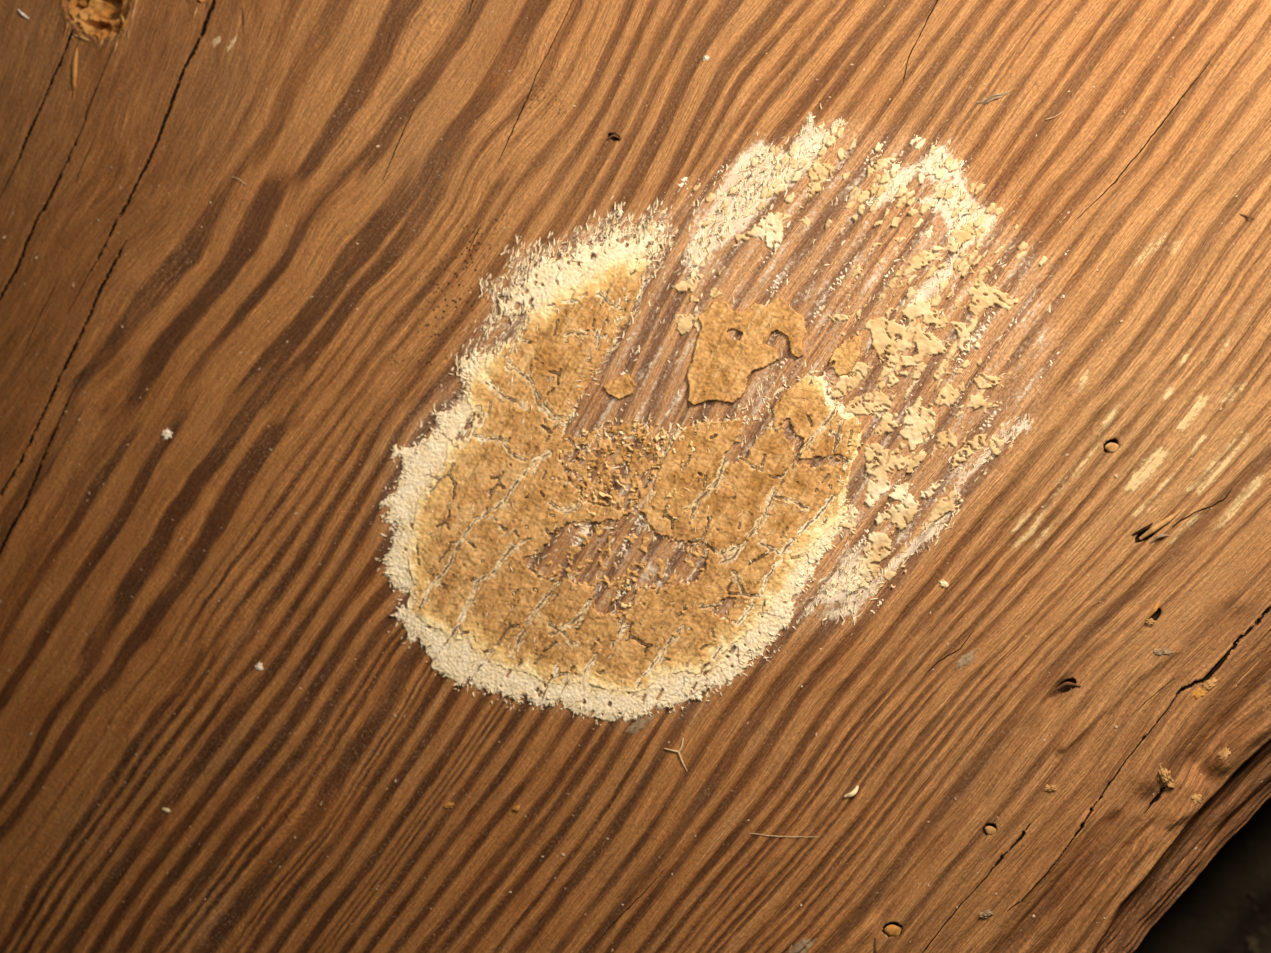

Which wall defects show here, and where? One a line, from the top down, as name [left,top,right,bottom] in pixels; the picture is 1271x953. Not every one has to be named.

crack [0,0,216,553]
crack [1172,489,1232,528]
crack [930,630,974,670]
crack [1007,607,1271,912]
crack [922,823,1031,953]